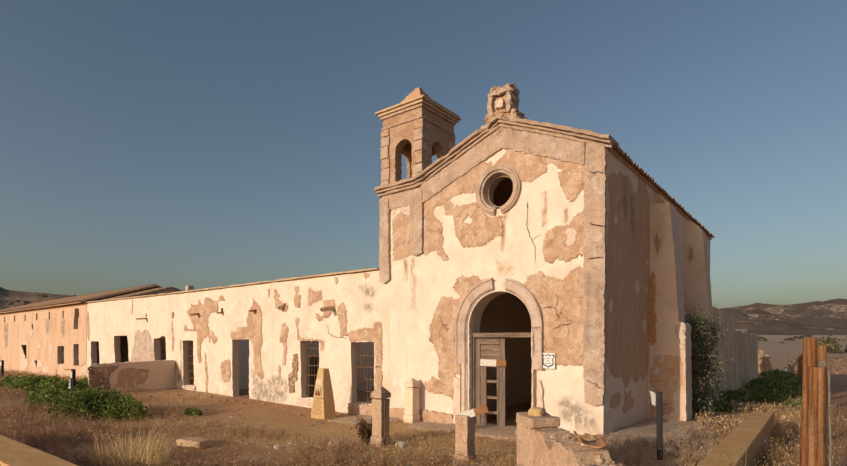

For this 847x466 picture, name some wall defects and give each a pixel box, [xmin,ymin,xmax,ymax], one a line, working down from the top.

flaking render [392,205,410,261]
flaking render [423,149,585,261]
flaking render [80,329,155,392]
flaking render [184,295,225,393]
flaking render [230,298,264,379]
flaking render [267,286,383,393]
flaking render [423,275,496,401]
flaking render [523,210,584,366]
flaking render [606,171,687,418]